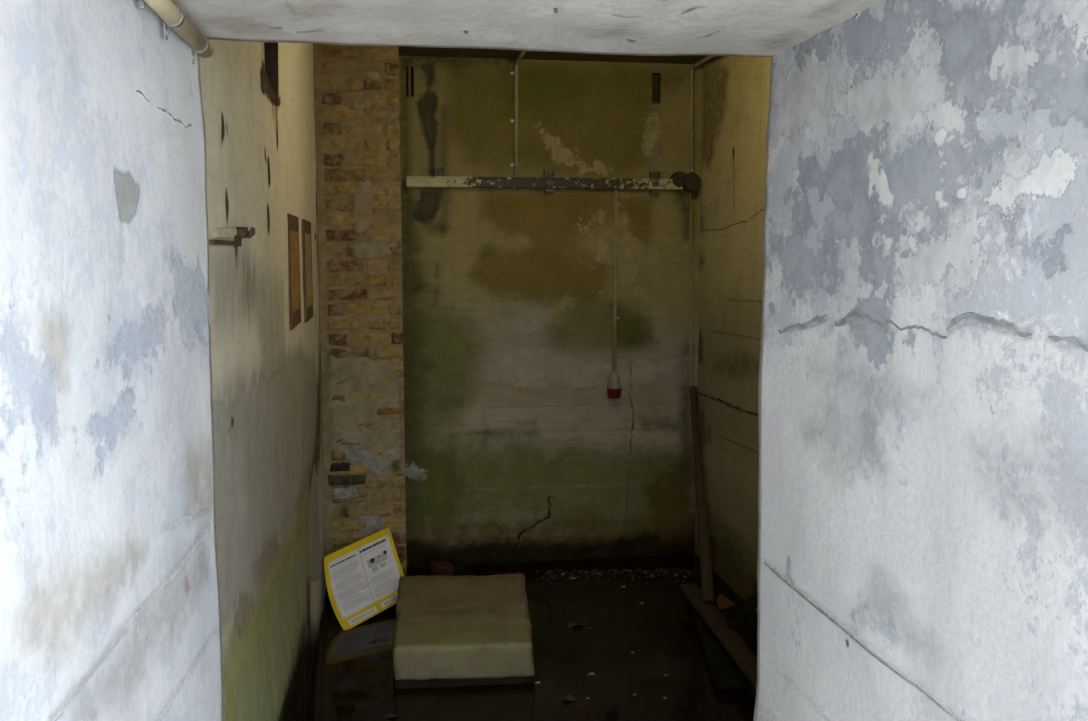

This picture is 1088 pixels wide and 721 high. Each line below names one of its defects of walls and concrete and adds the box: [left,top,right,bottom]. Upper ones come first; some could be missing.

crack [136,90,193,128]
damp [406,56,664,175]
peeling [531,122,614,178]
peeling [767,0,1088,369]
crack [778,311,1088,352]
crack [512,355,635,563]
damp [398,189,758,614]
damp [282,619,321,721]